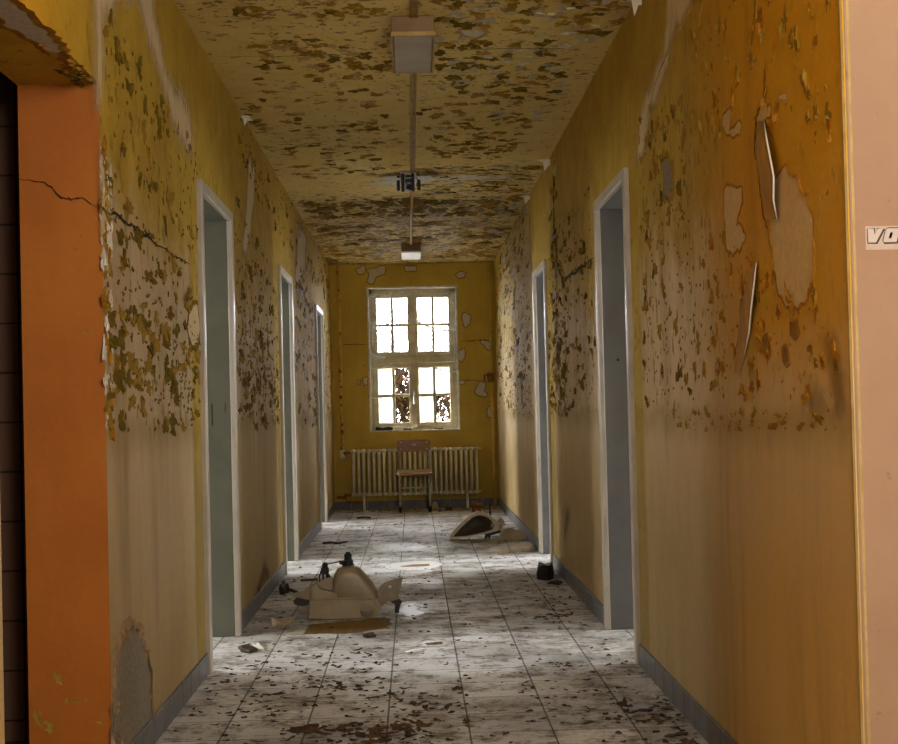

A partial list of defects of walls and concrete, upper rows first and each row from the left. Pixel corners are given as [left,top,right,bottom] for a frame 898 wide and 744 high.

crack [19,178,189,264]
flaking render [84,8,202,442]
peeling [224,0,275,18]
flaking render [235,0,631,432]
flaking render [638,0,839,432]
spalling [96,615,155,744]